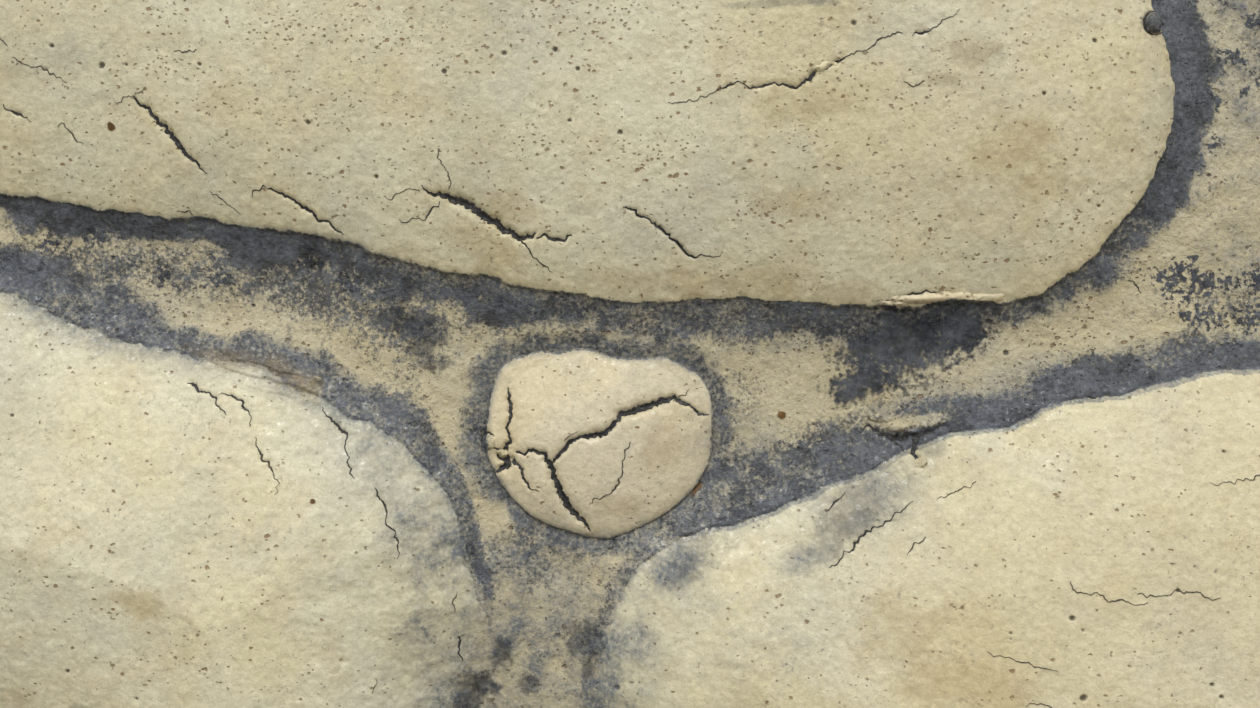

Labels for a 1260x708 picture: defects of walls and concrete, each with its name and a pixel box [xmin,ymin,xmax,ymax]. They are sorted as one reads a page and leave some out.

crack [668,9,960,104]
leakage [0,226,111,274]
leakage [151,263,175,283]
leakage [203,273,236,298]
crack [117,87,344,235]
crack [385,150,572,272]
crack [623,206,722,259]
leakage [1128,255,1260,336]
leakage [817,300,1000,407]
crack [188,382,280,492]
crack [322,407,400,559]
crack [494,387,709,532]